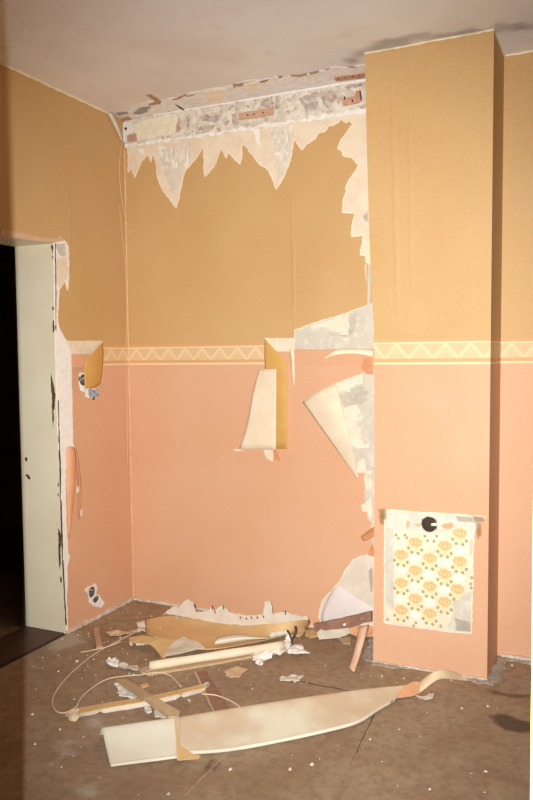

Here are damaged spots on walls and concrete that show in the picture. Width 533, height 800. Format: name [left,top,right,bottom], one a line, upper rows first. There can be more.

spalling [119,65,365,121]
flaking render [294,304,374,349]
flaking render [51,241,89,630]
flaking render [337,370,375,524]